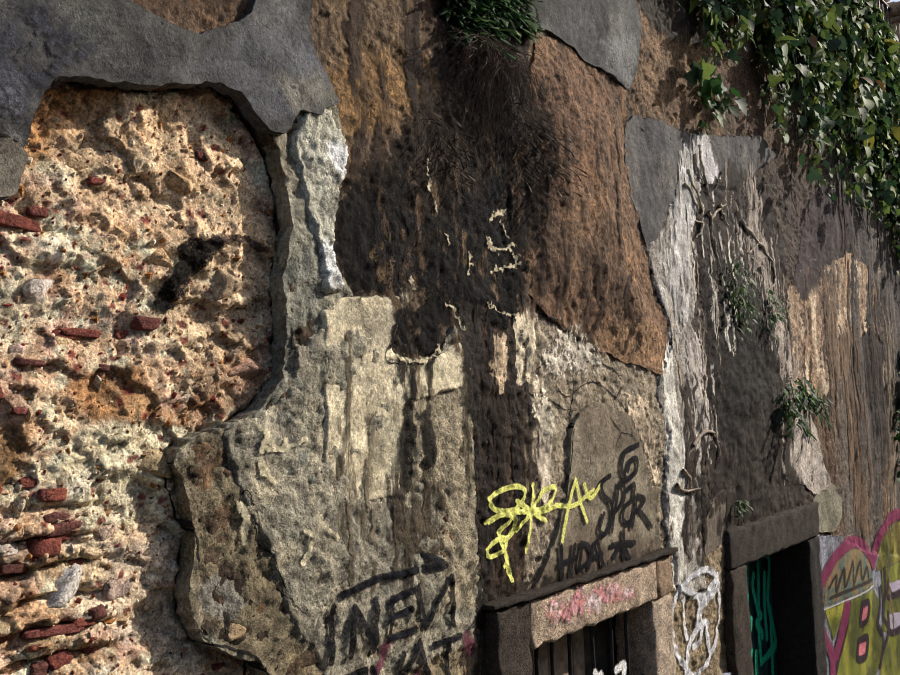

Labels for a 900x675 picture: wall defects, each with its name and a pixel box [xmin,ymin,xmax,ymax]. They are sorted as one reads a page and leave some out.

spalling [0,0,340,675]
leakage [289,0,900,675]